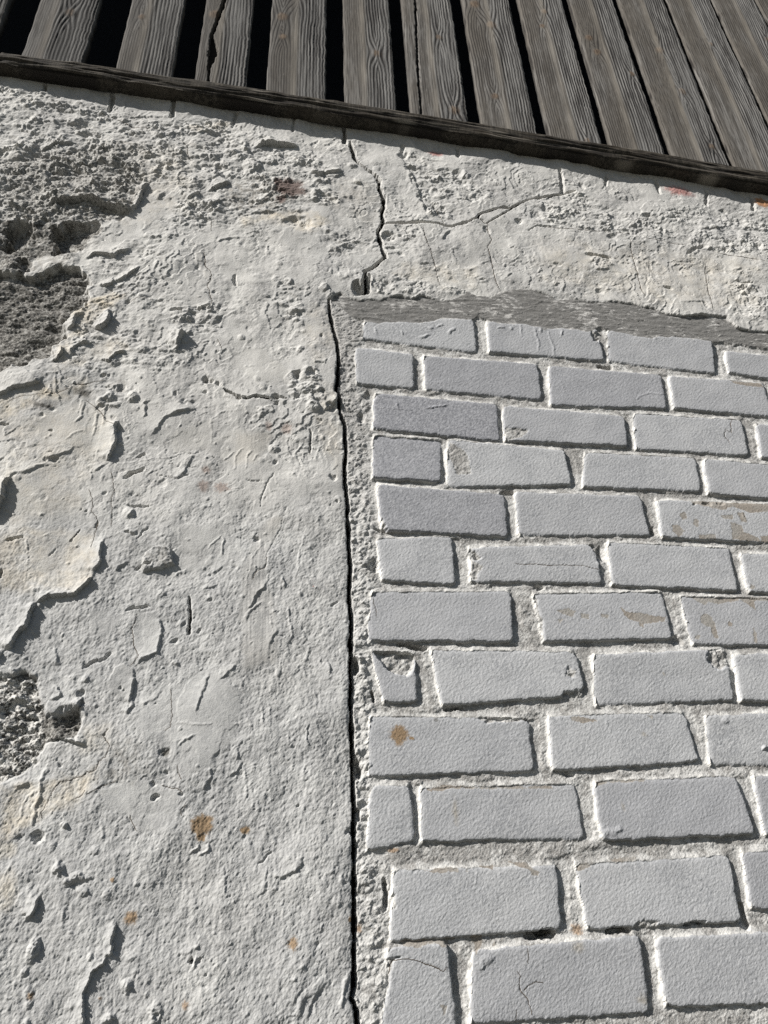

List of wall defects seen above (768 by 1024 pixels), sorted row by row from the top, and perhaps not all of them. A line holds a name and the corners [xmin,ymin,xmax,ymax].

spalling [0,133,155,224]
crack [364,177,520,296]
spalling [0,268,89,372]
spalling [0,444,81,513]
spalling [1,536,110,655]
crack [328,304,377,1024]
spalling [373,648,416,678]
spalling [0,673,84,782]
corrosion [385,720,416,749]
corrosion [187,810,218,843]
crack [388,958,447,974]
crack [515,948,543,1021]